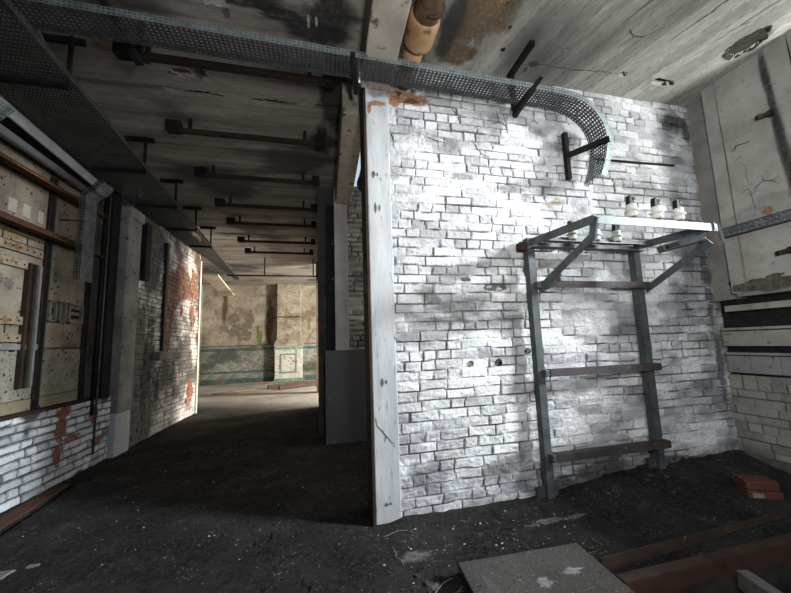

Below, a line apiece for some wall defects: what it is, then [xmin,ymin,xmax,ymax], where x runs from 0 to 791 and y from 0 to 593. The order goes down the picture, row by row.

damp [258,0,355,44]
spalling [722,25,772,60]
corrosion [368,89,428,113]
damp [759,57,791,190]
crack [713,84,779,285]
flaking render [180,269,198,322]